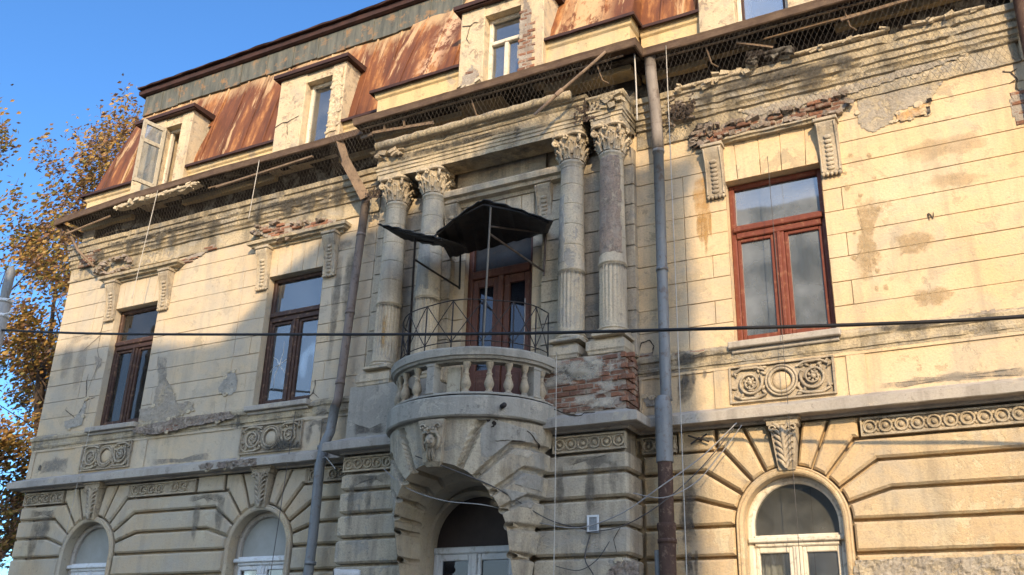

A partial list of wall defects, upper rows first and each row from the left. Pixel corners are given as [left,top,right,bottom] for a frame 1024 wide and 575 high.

flaking render [517,0,535,71]
flaking render [668,26,969,150]
flaking render [249,218,336,245]
spalling [132,384,234,435]
spalling [218,369,238,397]
flaking render [544,351,656,415]